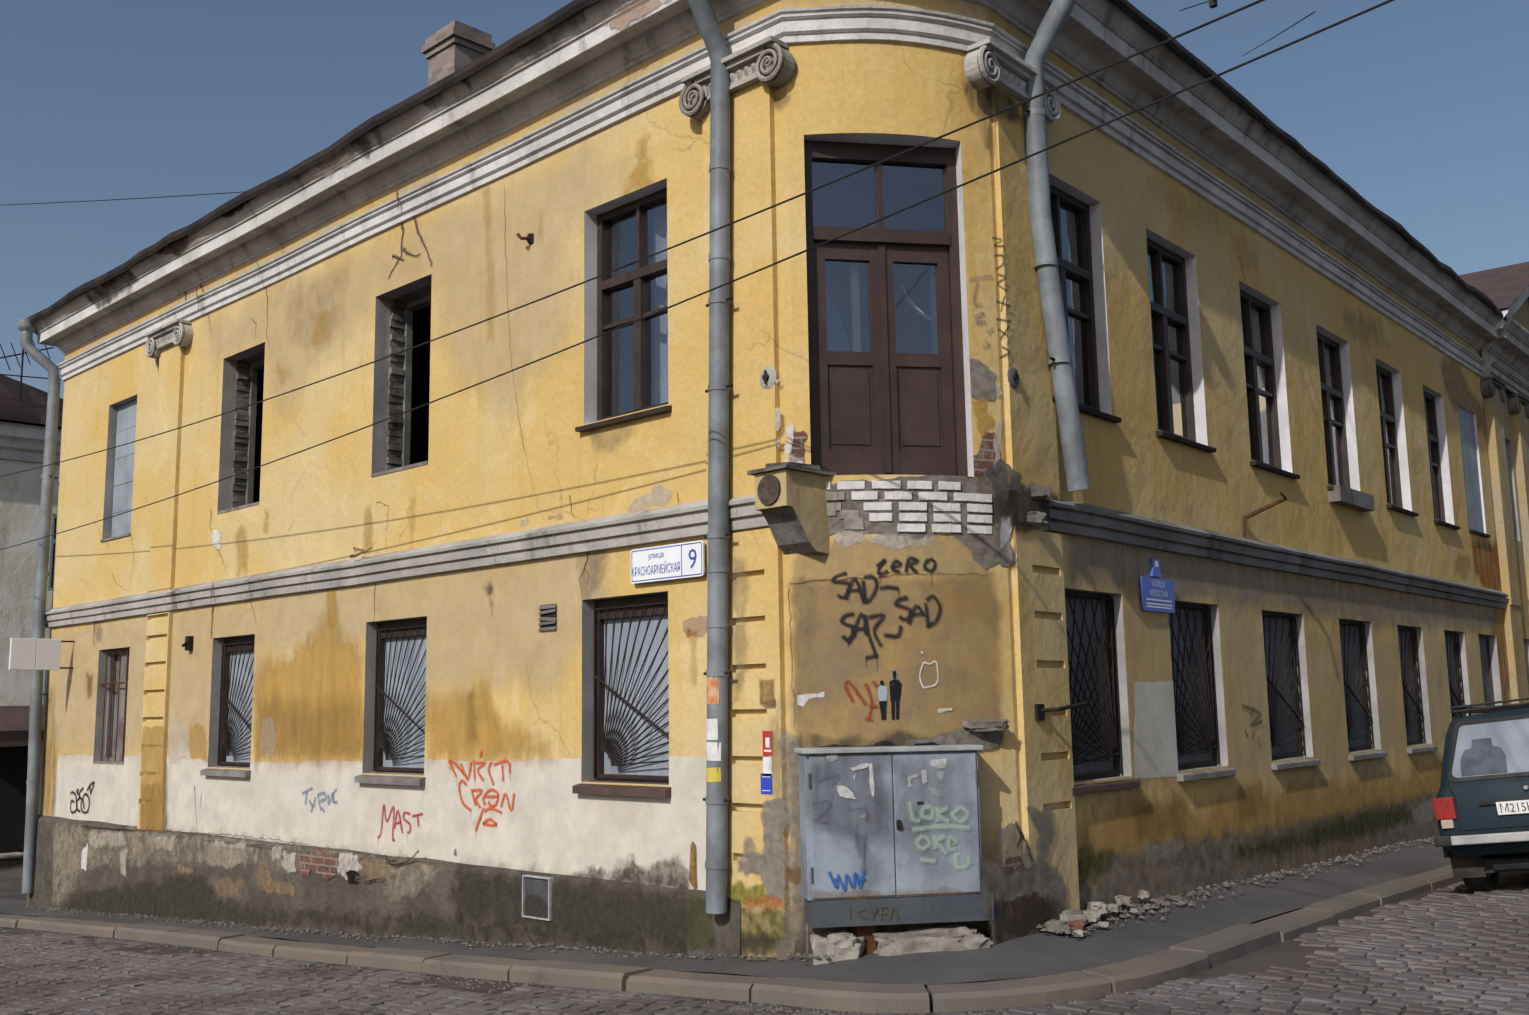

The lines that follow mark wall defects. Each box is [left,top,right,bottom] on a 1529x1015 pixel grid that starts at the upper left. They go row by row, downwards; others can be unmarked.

crack [388,182,432,279]
spalling [826,358,1059,570]
leakage [256,588,362,759]
leakage [430,687,545,760]
spalling [53,825,428,903]
spalling [997,806,1054,874]
leakage [876,793,1440,945]
leakage [778,891,852,960]